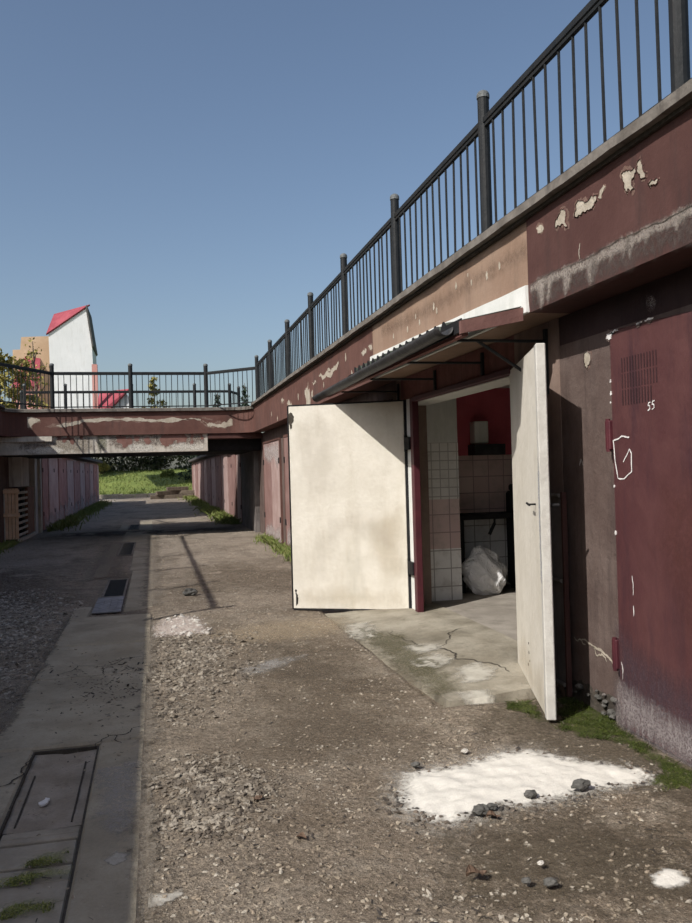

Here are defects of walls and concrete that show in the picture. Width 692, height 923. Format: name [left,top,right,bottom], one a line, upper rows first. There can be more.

peeling [620,155,660,196]
peeling [536,184,606,235]
water stain [530,205,692,308]
peeling [271,353,353,429]
peeling [25,417,233,454]
crack [389,627,508,671]
crack [0,755,33,787]